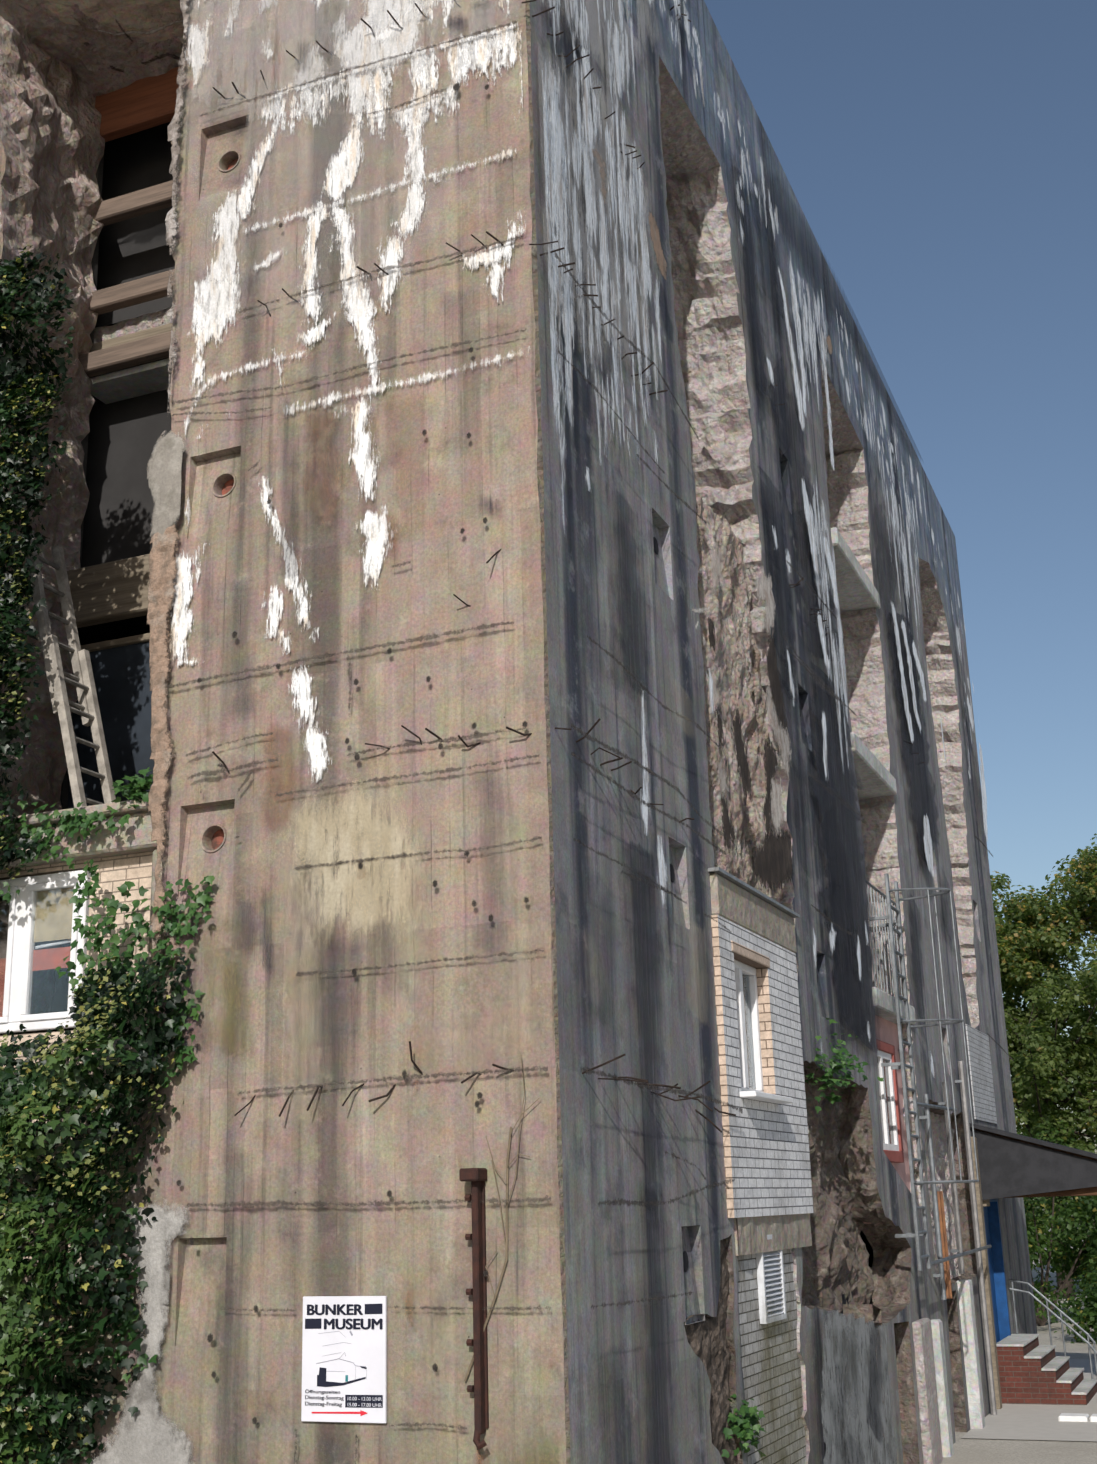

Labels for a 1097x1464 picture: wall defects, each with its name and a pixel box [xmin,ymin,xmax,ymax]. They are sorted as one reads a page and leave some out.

spalling [165,0,189,413]
water stain [184,0,530,587]
water stain [542,0,662,533]
water stain [260,476,332,783]
water stain [296,793,414,932]
spalling [401,722,481,749]
spalling [506,0,668,1464]
water stain [615,492,670,1464]
spalling [582,1054,736,1133]
peeling [679,493,804,902]
water stain [649,0,946,1052]
spalling [684,1239,736,1464]